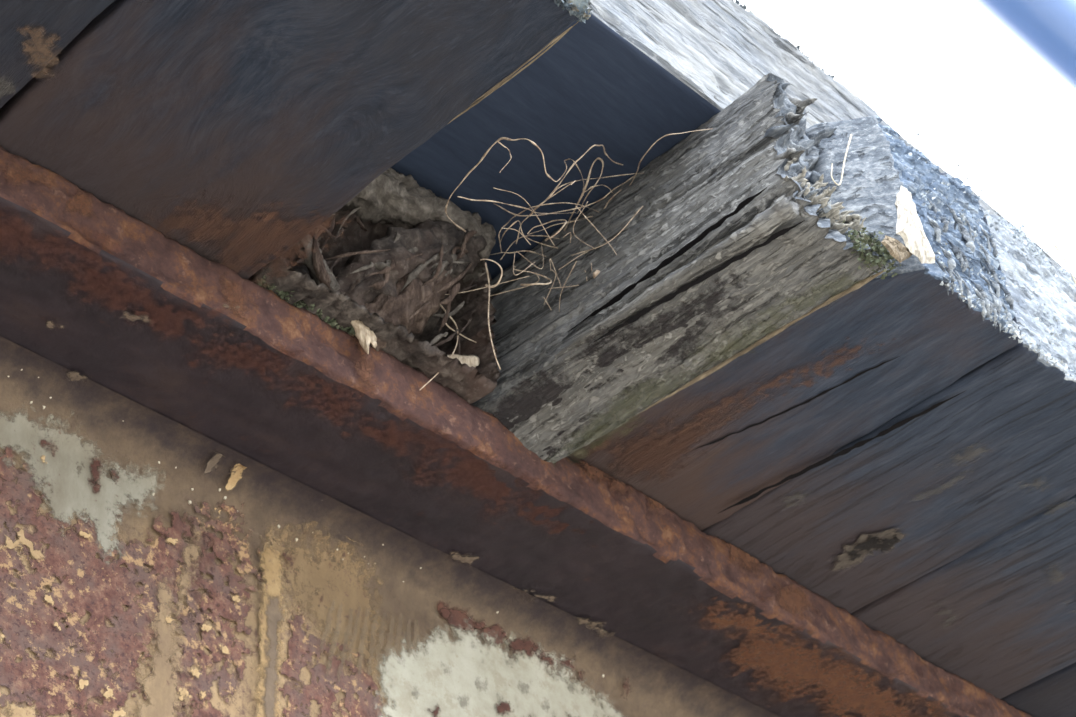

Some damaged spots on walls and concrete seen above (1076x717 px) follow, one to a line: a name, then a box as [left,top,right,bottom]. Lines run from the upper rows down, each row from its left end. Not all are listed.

crack [568,187,805,342]
peeling [68,371,87,381]
peeling [0,412,162,560]
peeling [204,452,247,491]
crack [694,356,900,450]
crack [719,390,967,513]
corrosion [0,439,263,717]
peeling [0,693,36,717]
corrosion [277,606,383,717]
corrosion [496,702,511,716]
corrosion [437,601,582,682]
corrosion [690,597,950,717]